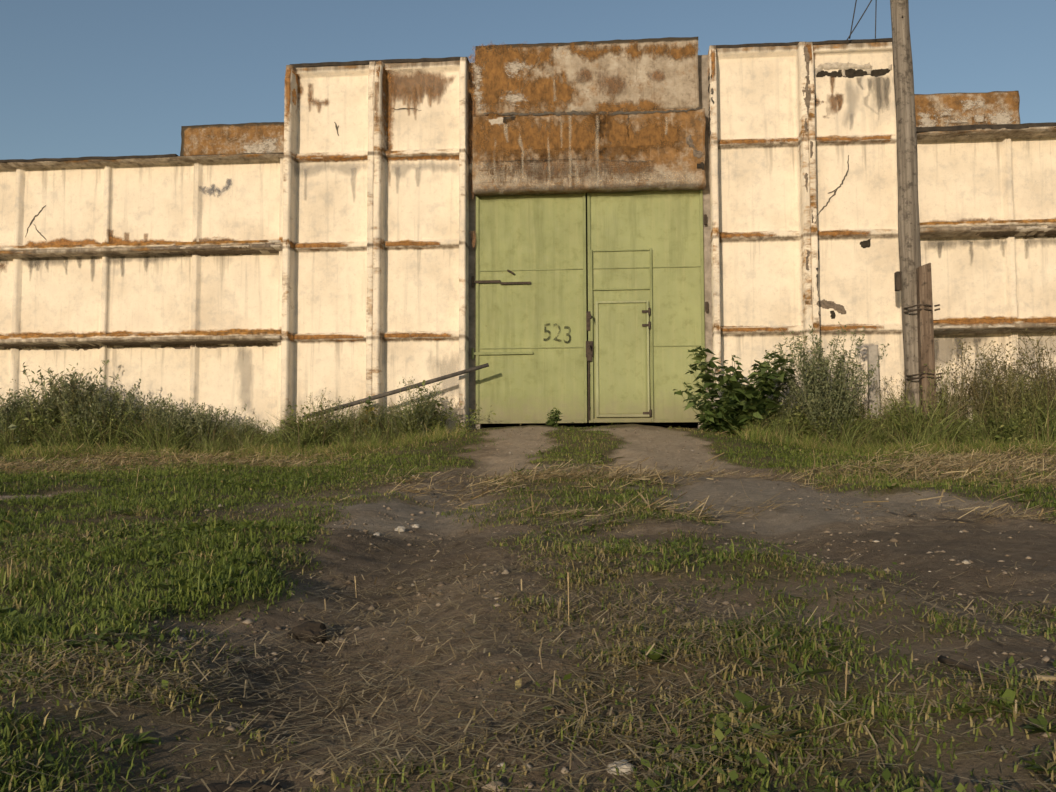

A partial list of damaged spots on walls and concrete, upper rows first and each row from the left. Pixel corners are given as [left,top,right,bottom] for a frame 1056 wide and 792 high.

corrosion [374,42,697,199]
spalling [802,46,892,158]
crack [25,205,46,240]
corrosion [25,230,167,246]
crack [815,155,849,223]
spalling [810,290,846,319]